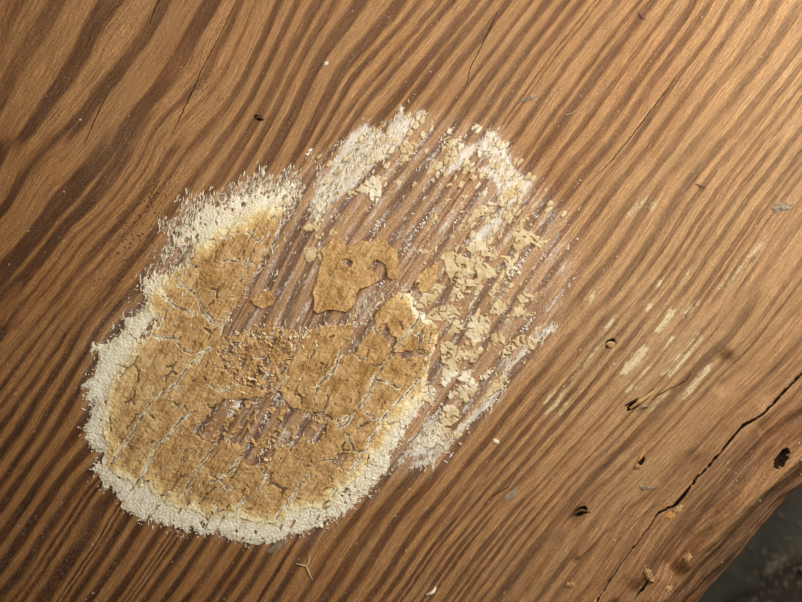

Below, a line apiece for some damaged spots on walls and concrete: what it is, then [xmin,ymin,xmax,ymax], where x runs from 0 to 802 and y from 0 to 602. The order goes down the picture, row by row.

crack [597,372,802,602]